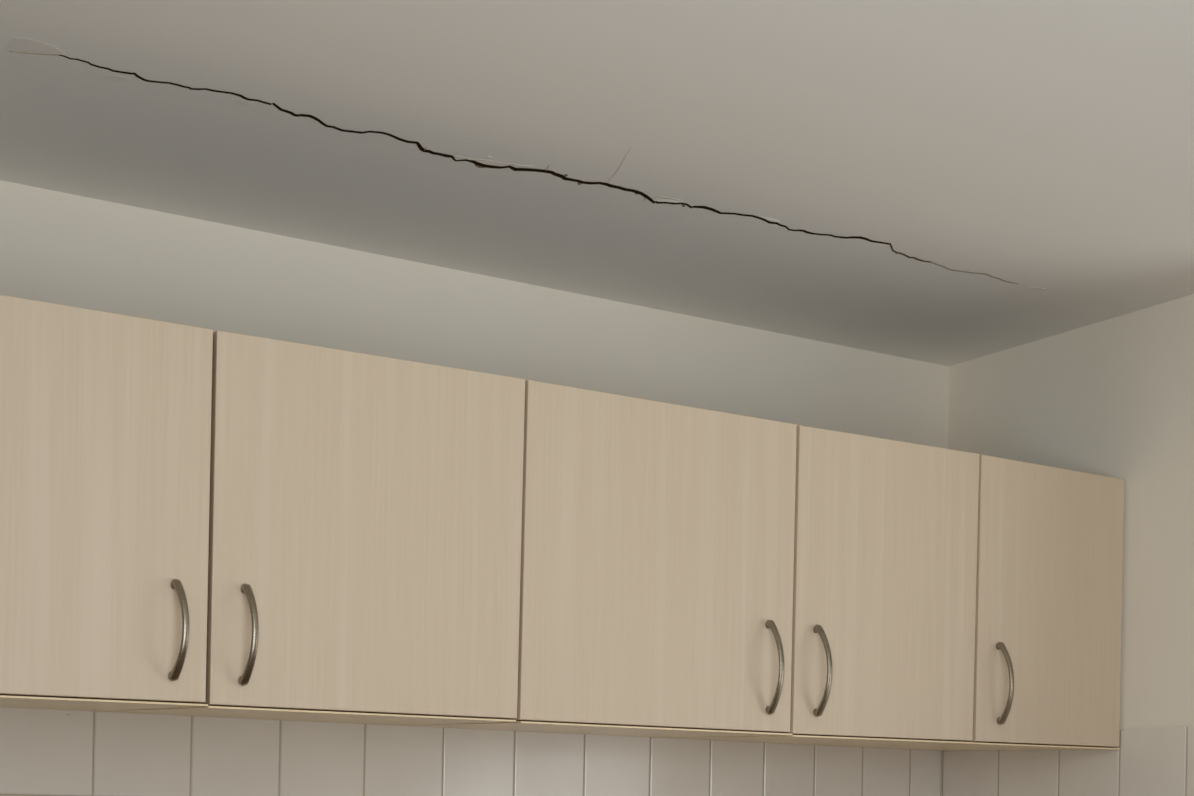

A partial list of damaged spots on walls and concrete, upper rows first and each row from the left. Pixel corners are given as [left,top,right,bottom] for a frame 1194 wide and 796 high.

crack [9,51,1018,284]